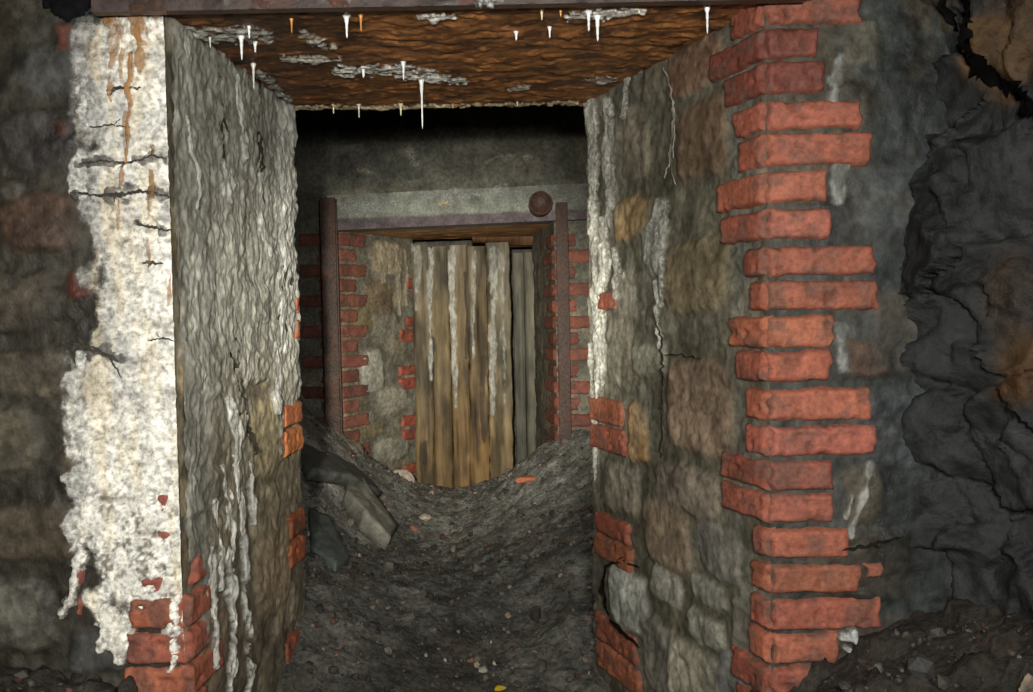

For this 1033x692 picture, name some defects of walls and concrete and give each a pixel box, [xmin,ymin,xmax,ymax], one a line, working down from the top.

leakage [418,13,456,24]
leakage [564,7,647,23]
crack [937,0,1033,118]
crack [106,85,141,95]
corrosion [103,0,166,184]
crack [89,119,130,128]
crack [70,148,171,236]
crack [142,260,163,268]
leakage [57,15,641,692]
crack [996,388,1033,432]